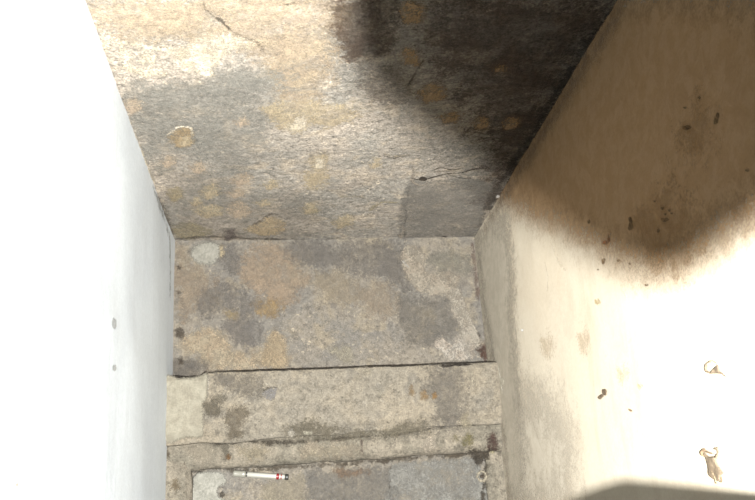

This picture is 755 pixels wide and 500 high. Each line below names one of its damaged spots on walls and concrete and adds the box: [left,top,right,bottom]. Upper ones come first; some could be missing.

leakage [330,0,401,64]
leakage [507,9,616,176]
crack [385,154,479,238]
crack [173,361,495,379]